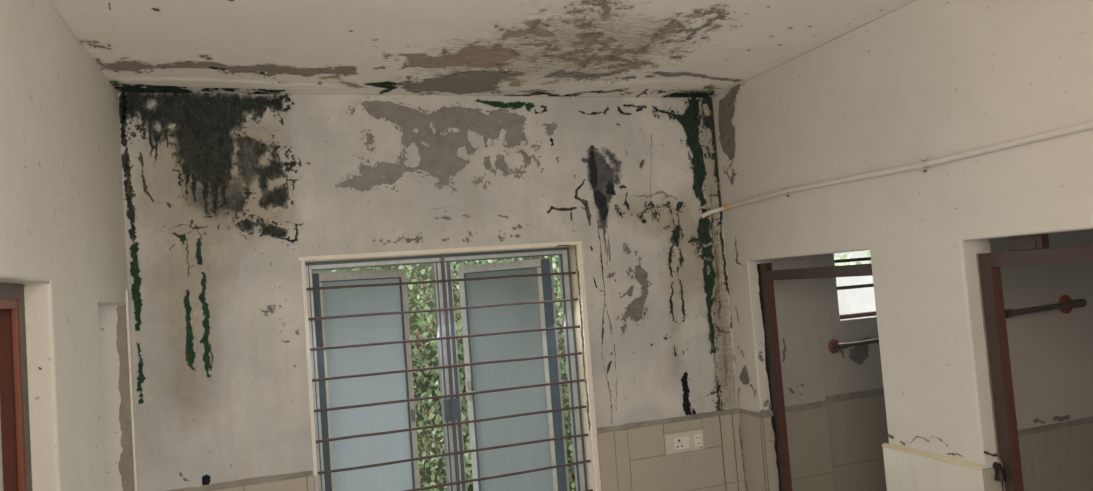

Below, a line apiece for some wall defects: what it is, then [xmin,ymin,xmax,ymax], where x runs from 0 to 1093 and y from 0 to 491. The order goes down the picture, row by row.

flaking render [80,40,357,85]
peeling [335,0,750,195]
leakage [475,85,732,354]
leakage [110,81,310,491]
peeling [606,242,652,336]
leakage [692,375,725,414]
peeling [839,337,871,377]